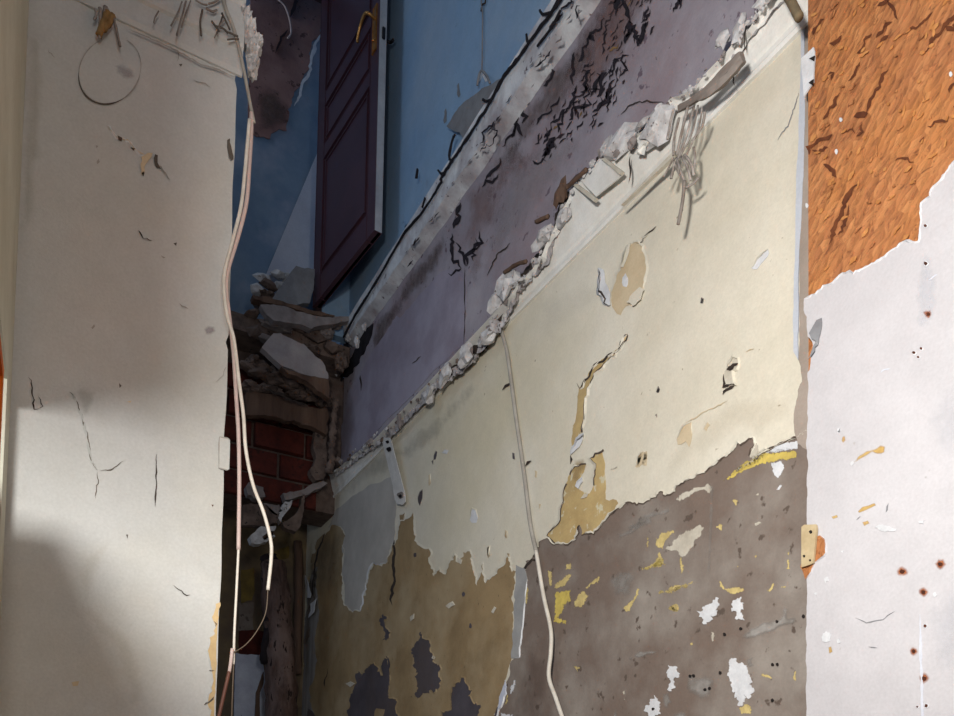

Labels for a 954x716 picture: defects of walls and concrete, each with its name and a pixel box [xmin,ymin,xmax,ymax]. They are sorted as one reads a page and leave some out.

crack [673,0,682,11]
crack [482,0,657,187]
spalling [806,0,954,199]
spalling [829,170,875,249]
crack [448,203,509,335]
peeling [596,240,649,315]
peeling [334,227,563,477]
crack [577,334,628,390]
crack [70,392,121,498]
crack [151,454,159,503]
crack [388,542,396,604]
peeling [303,335,827,716]